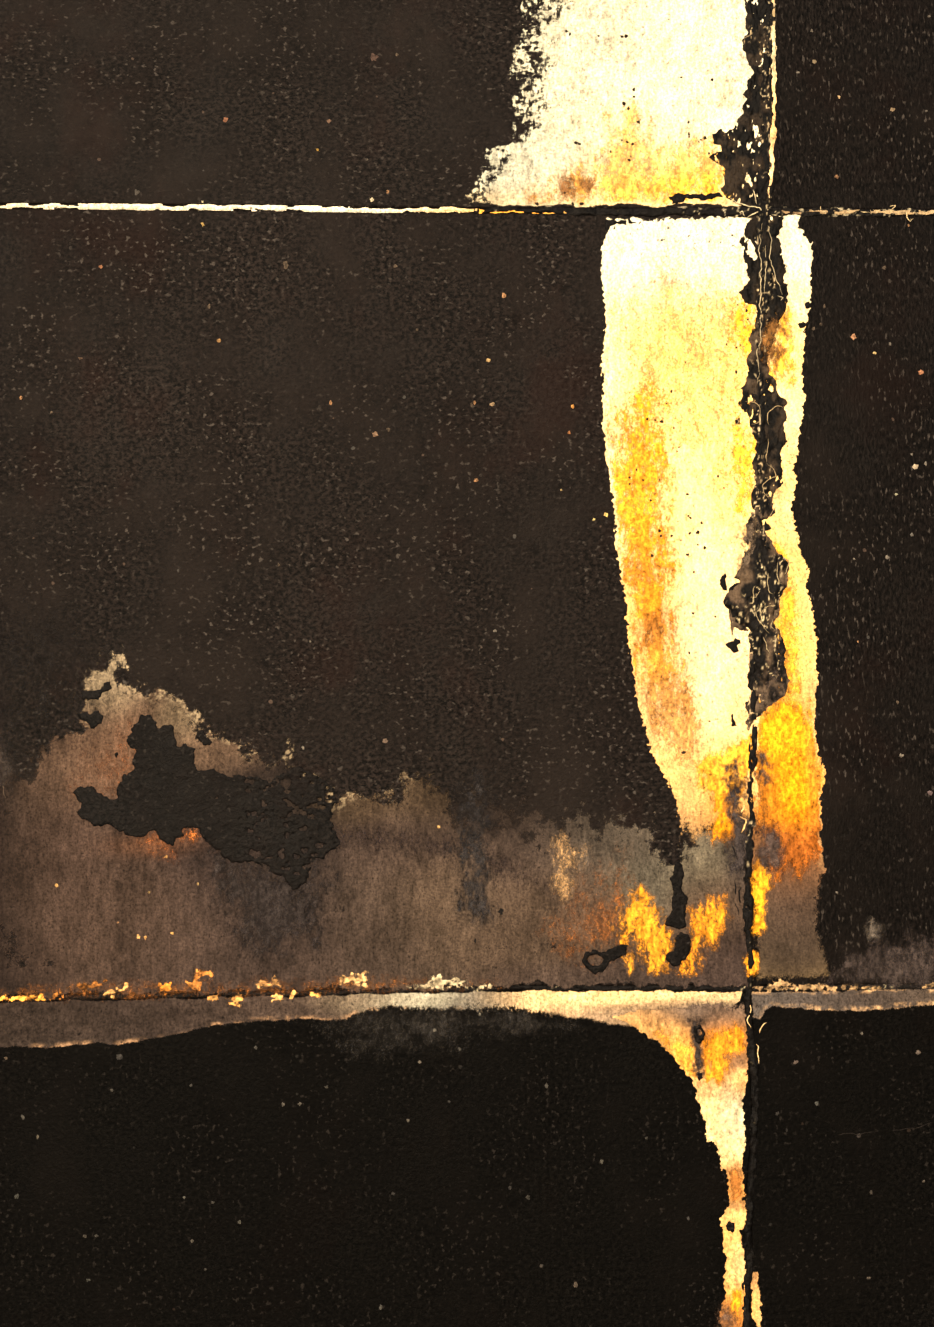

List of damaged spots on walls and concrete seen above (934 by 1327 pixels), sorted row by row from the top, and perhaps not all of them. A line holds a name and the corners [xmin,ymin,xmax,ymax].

peeling [466,0,774,207]
corrosion [525,102,725,205]
corrosion [608,273,821,934]
crack [753,558,789,655]
peeling [0,214,829,1327]
leakage [193,844,344,958]
leakage [333,770,556,924]
leakage [409,974,493,990]
corrosion [560,880,727,975]
crack [732,781,758,913]
corrosion [744,950,760,977]
peeling [752,989,934,1019]